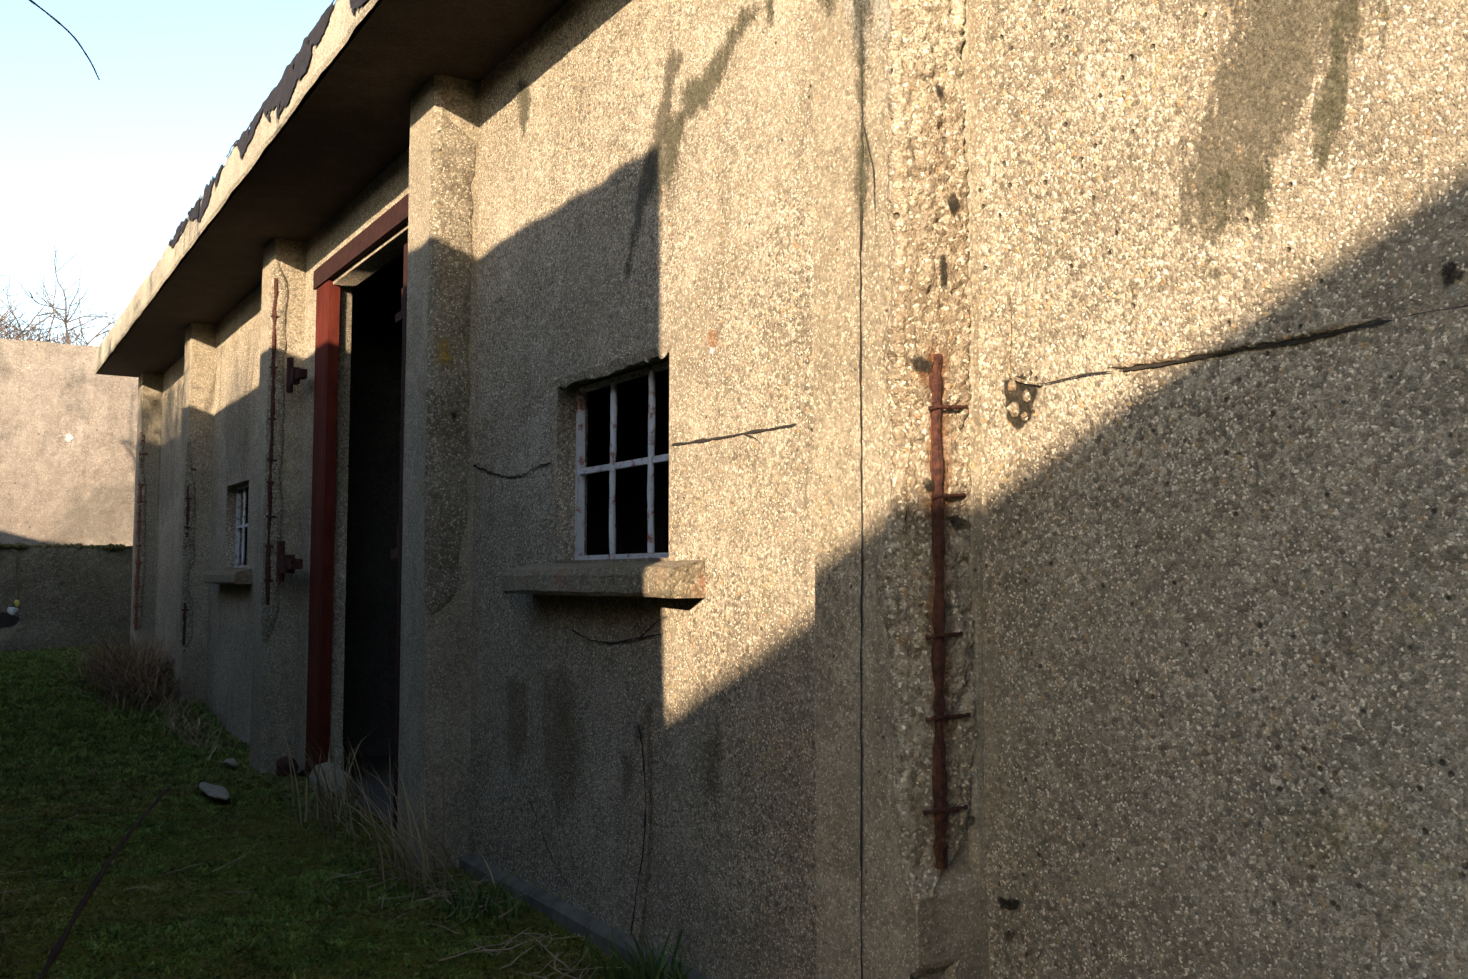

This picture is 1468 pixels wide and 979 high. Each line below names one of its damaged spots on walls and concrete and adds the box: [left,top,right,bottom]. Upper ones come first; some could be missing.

peeling [168,0,366,248]
water stain [650,0,773,202]
water stain [1179,0,1390,277]
spalling [875,0,977,899]
crack [1033,305,1468,386]